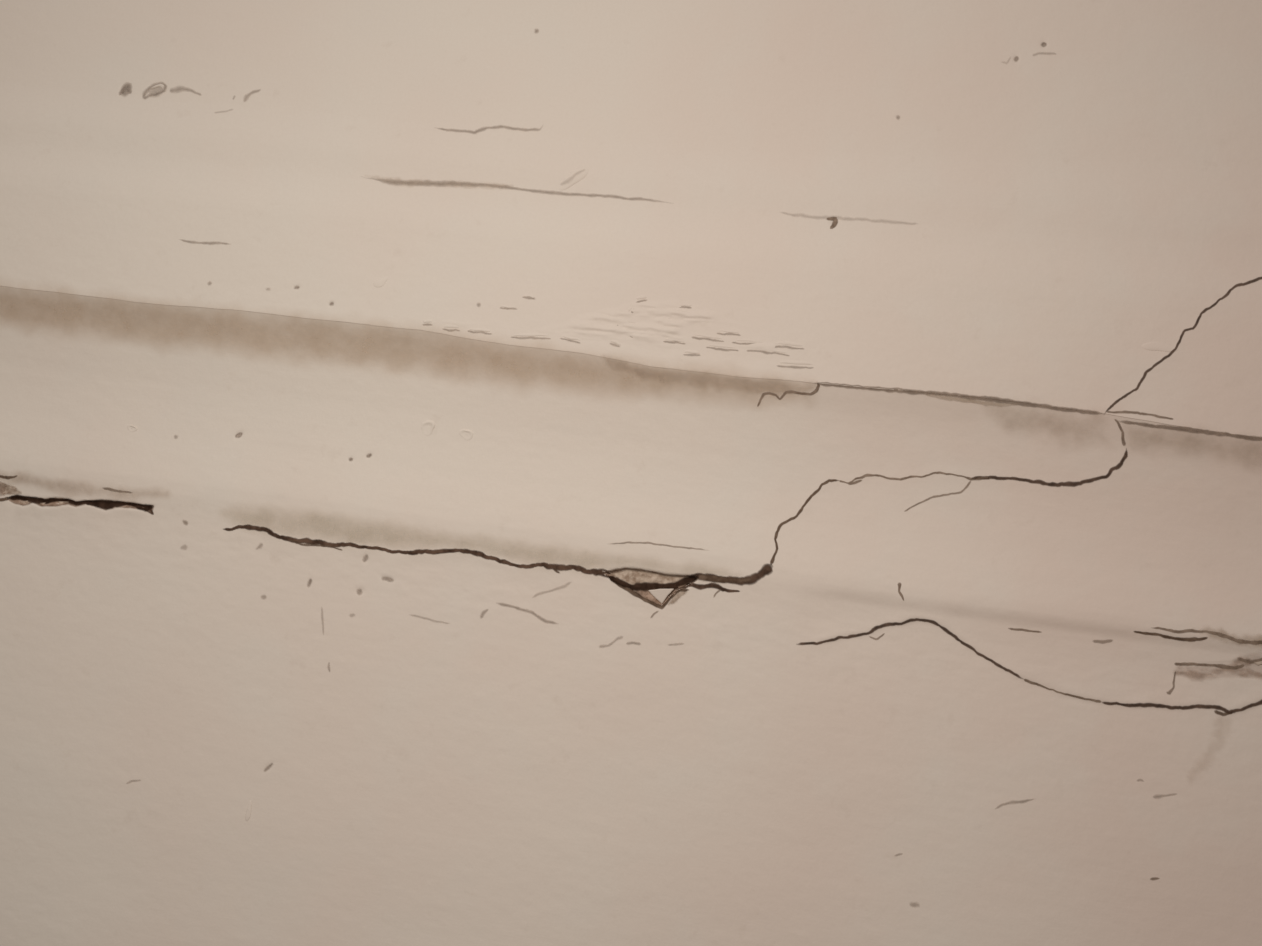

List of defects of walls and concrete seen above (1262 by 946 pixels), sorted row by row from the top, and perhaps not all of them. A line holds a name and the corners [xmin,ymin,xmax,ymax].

crack [673,277,1262,596]
peeling [0,475,20,494]
crack [0,488,154,514]
crack [224,525,633,590]
flaking render [605,568,697,609]
crack [799,583,1262,716]
peeling [1167,658,1262,694]